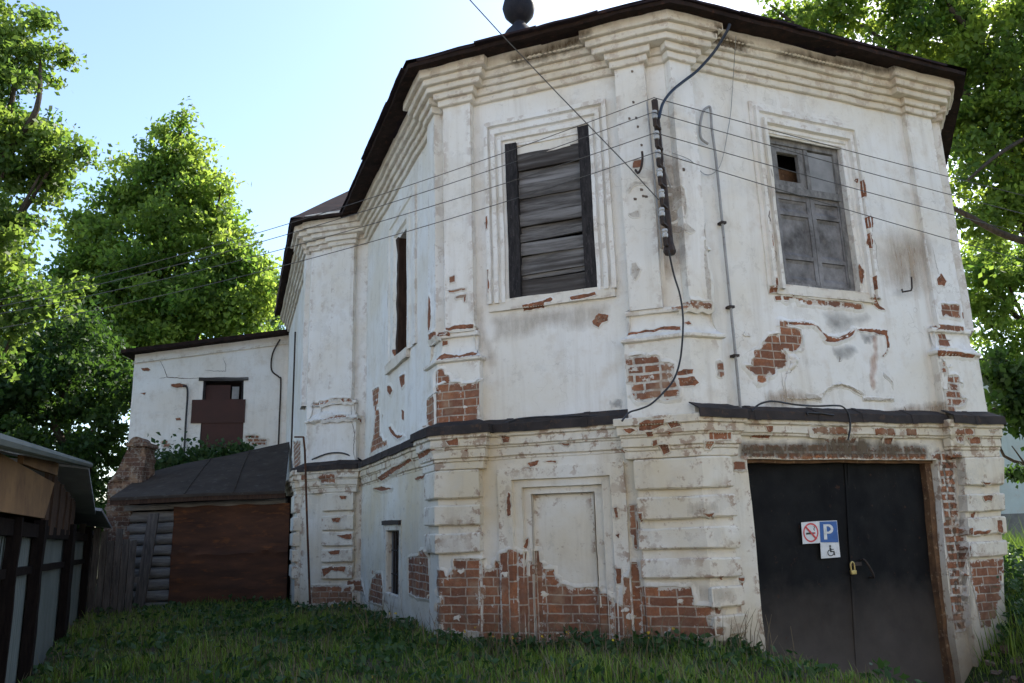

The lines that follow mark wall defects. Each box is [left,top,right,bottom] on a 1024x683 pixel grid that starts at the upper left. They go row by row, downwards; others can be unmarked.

spalling [854,179,868,199]
spalling [864,215,874,250]
spalling [311,371,406,457]
spalling [422,293,483,428]
spalling [625,350,700,406]
spalling [741,263,890,388]
spalling [505,491,513,518]
spalling [703,300,1004,633]
spalling [308,517,384,608]
spalling [407,504,730,646]